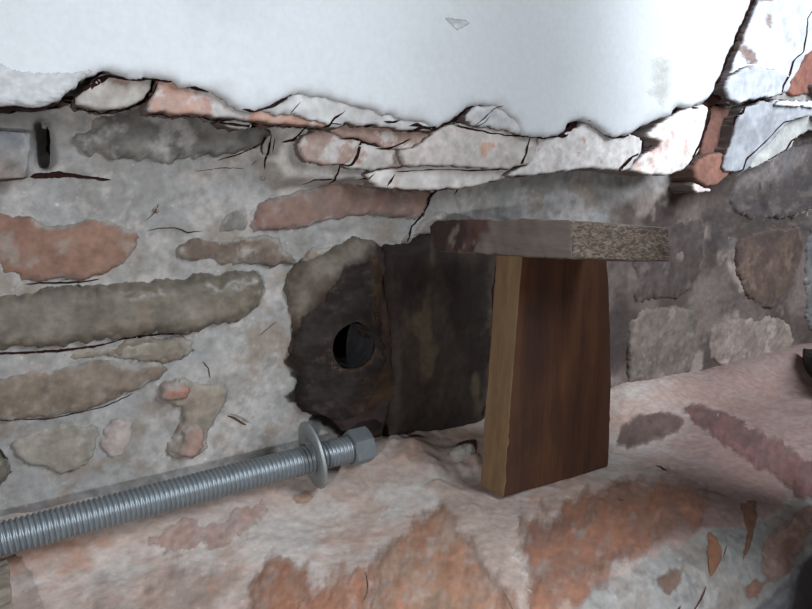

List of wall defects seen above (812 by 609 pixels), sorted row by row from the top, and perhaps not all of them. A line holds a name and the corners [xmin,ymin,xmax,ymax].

peeling [210,120,251,133]
crack [0,74,651,243]
peeling [668,181,710,194]
crack [671,0,755,166]
peeling [712,0,812,173]
crack [739,116,804,171]
crack [733,11,812,128]
spalling [250,506,518,609]
spalling [519,480,707,609]
crack [678,546,727,609]
spalling [617,405,812,597]